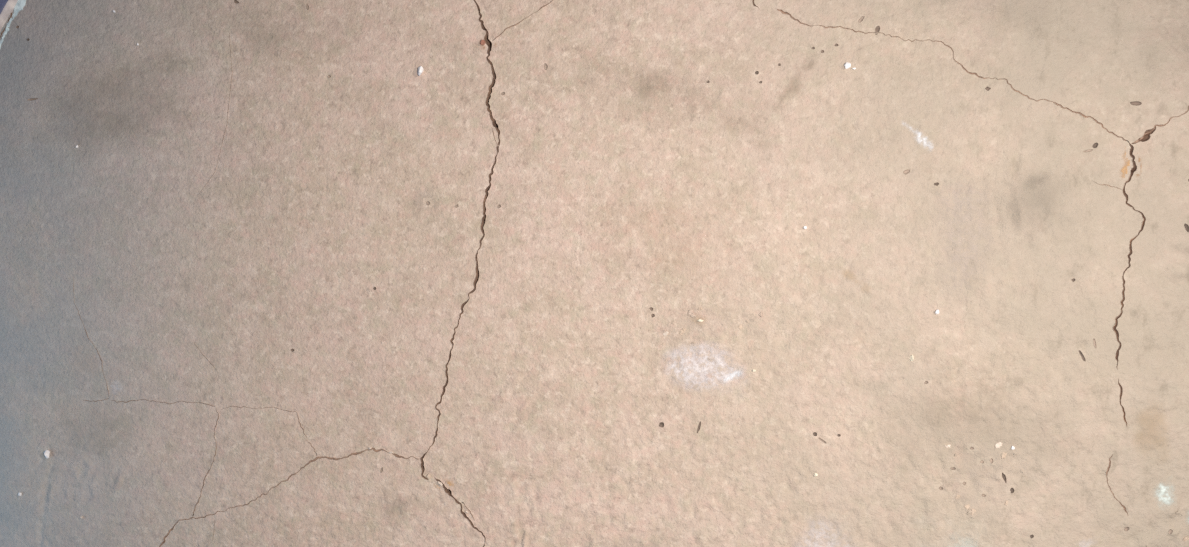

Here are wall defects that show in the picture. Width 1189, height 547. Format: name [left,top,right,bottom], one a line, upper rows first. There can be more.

crack [73,0,554,547]
crack [752,0,1189,426]
crack [1106,454,1128,515]